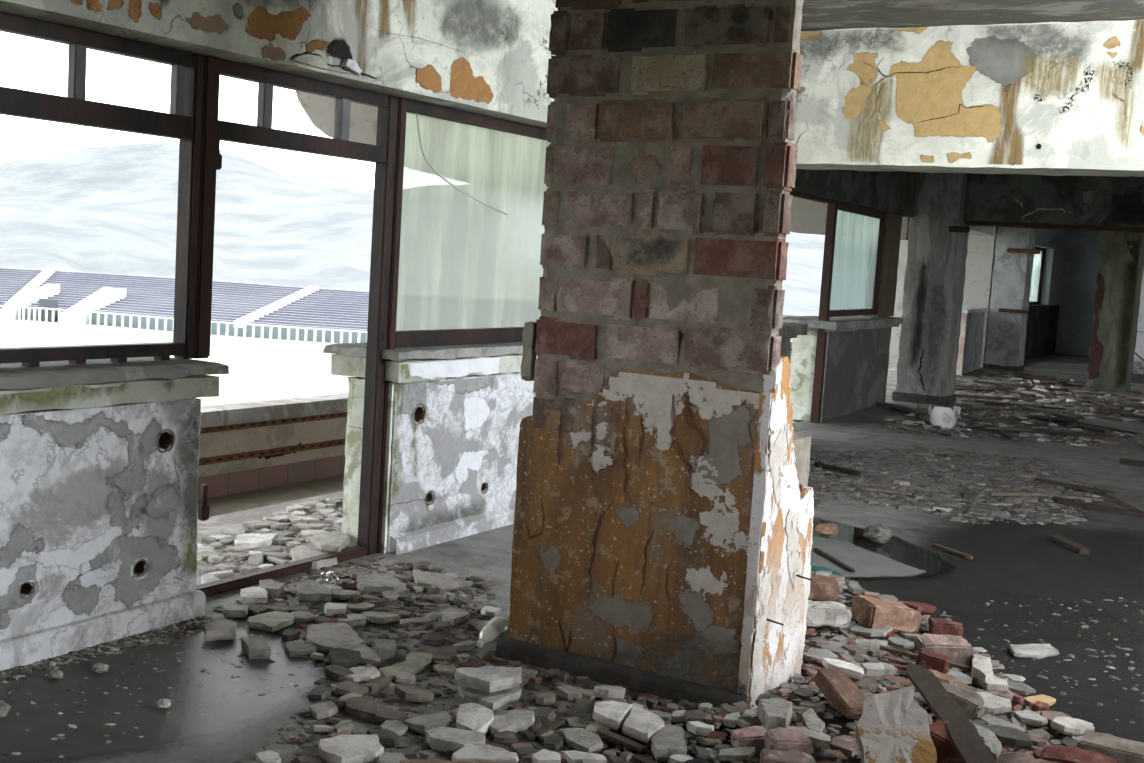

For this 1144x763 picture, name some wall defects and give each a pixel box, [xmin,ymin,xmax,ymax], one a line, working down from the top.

peeling [185,3,377,79]
corrosion [356,0,367,38]
corrosion [379,0,389,37]
corrosion [403,0,415,20]
peeling [416,57,494,104]
peeling [843,36,1036,143]
damp [989,24,1095,114]
damp [179,409,200,529]
peeling [569,422,614,474]
peeling [587,372,766,557]
damp [407,507,482,532]
peeling [678,565,775,701]